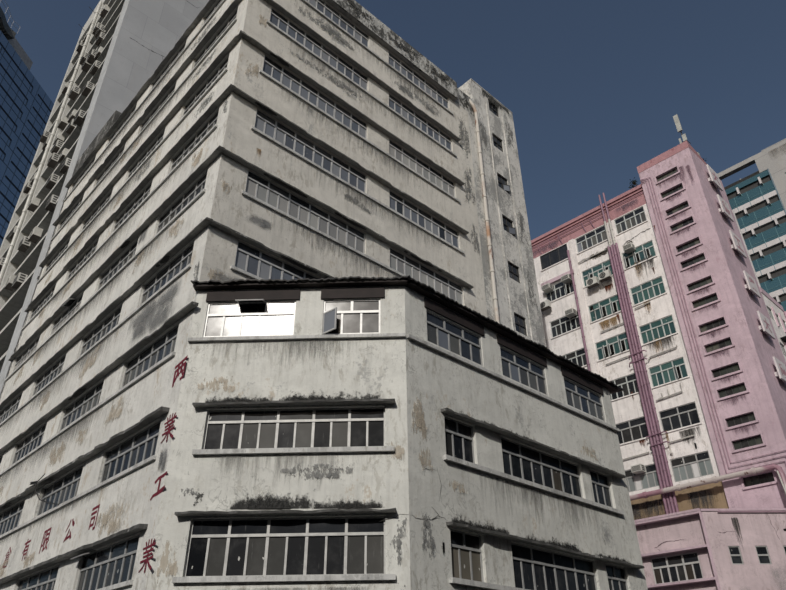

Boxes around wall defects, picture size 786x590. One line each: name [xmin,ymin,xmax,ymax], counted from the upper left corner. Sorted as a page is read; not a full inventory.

leakage [133,285,176,337]
rust [600,314,620,329]
flaking render [280,463,353,480]